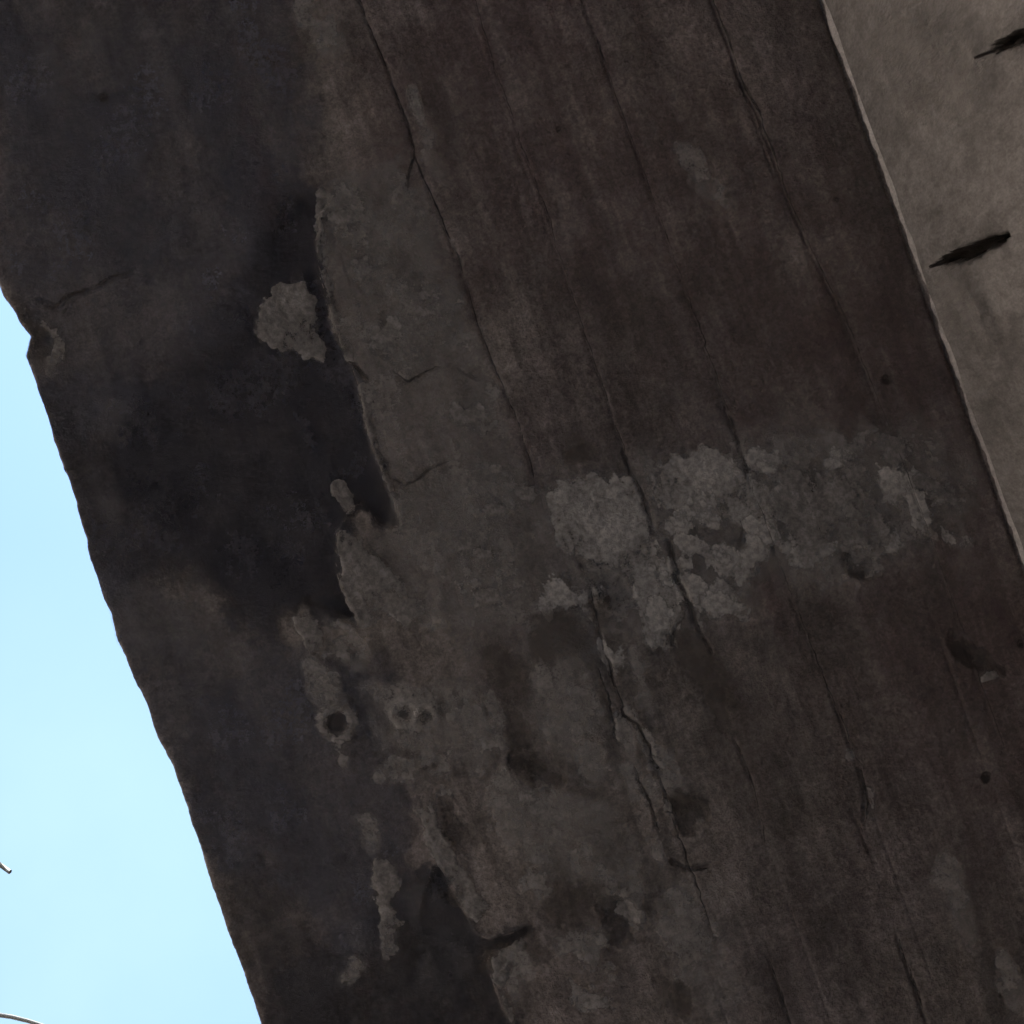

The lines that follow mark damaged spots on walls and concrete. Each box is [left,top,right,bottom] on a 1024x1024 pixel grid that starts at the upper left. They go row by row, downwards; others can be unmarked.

peeling [211,186,354,365]
crack [359,0,502,383]
water stain [0,0,524,1024]
spalling [358,382,394,497]
peeling [330,479,427,628]
water stain [427,425,969,652]
crack [597,40,869,839]
spalling [414,803,491,926]
spalling [432,926,533,1024]
crack [590,584,711,928]